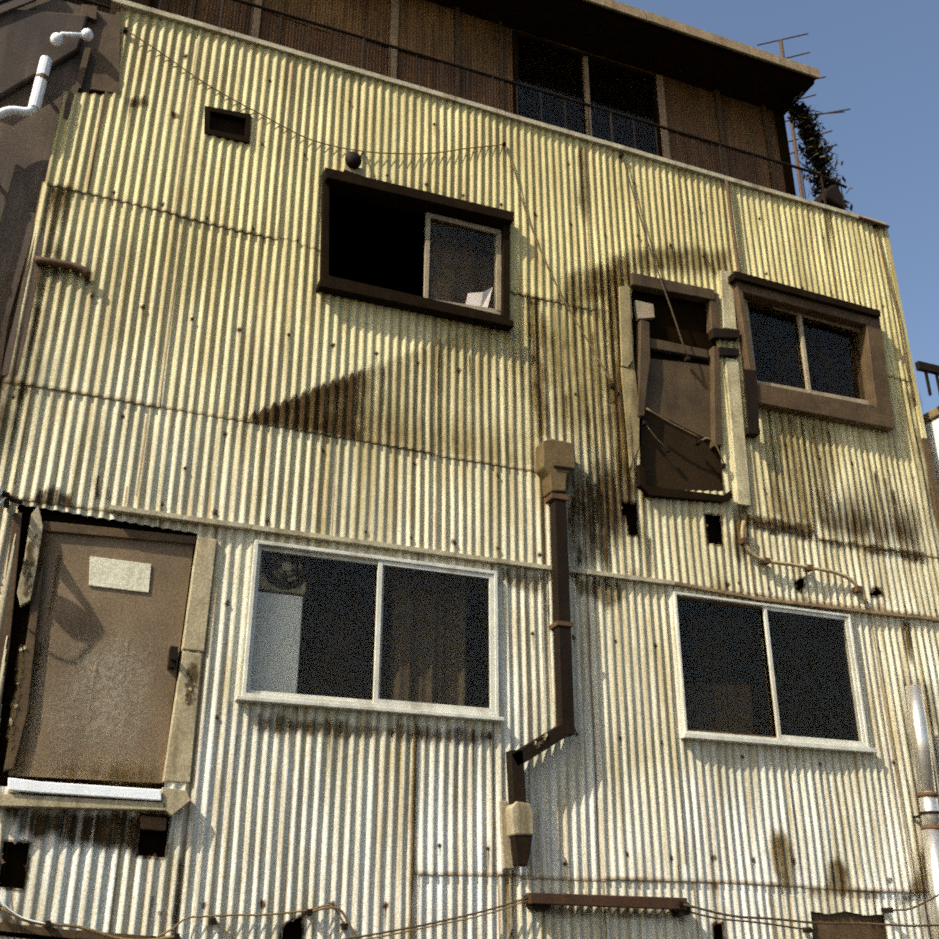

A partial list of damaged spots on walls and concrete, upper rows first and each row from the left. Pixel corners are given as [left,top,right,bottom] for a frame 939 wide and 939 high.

rust [828,859,847,895]